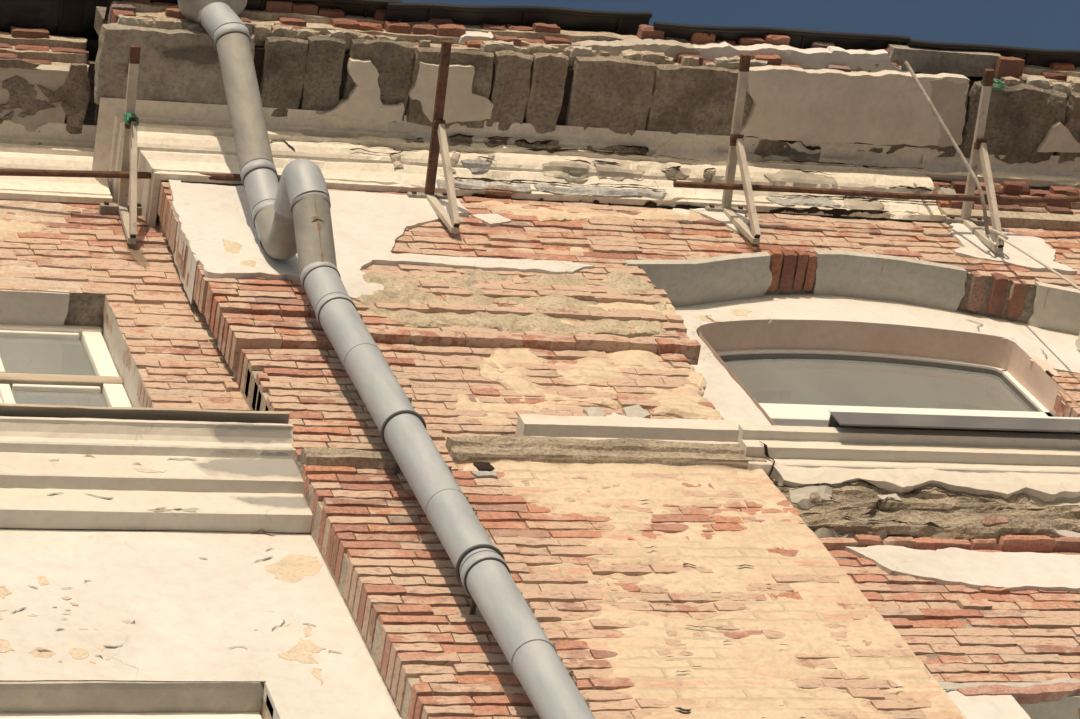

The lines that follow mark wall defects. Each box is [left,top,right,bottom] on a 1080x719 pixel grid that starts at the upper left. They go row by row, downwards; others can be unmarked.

spalling [0,58,91,128]
flaking render [168,180,300,304]
spalling [316,58,1080,592]
spalling [300,447,396,469]
crack [759,441,998,528]
peeling [254,548,323,583]
peeling [0,585,39,620]
peeling [52,587,79,630]
peeling [28,643,123,663]
peeling [277,623,342,685]
crack [521,592,590,704]
spalling [938,678,1080,704]